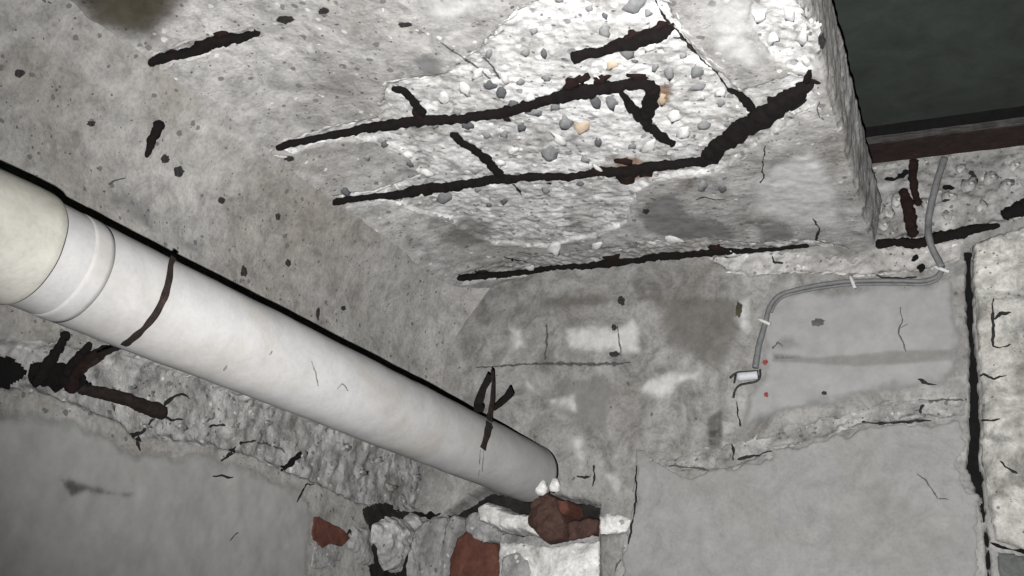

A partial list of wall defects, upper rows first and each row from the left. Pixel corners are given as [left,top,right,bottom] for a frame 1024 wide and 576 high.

flaking render [0,338,422,576]
spalling [270,0,1024,576]
crack [862,252,1024,576]